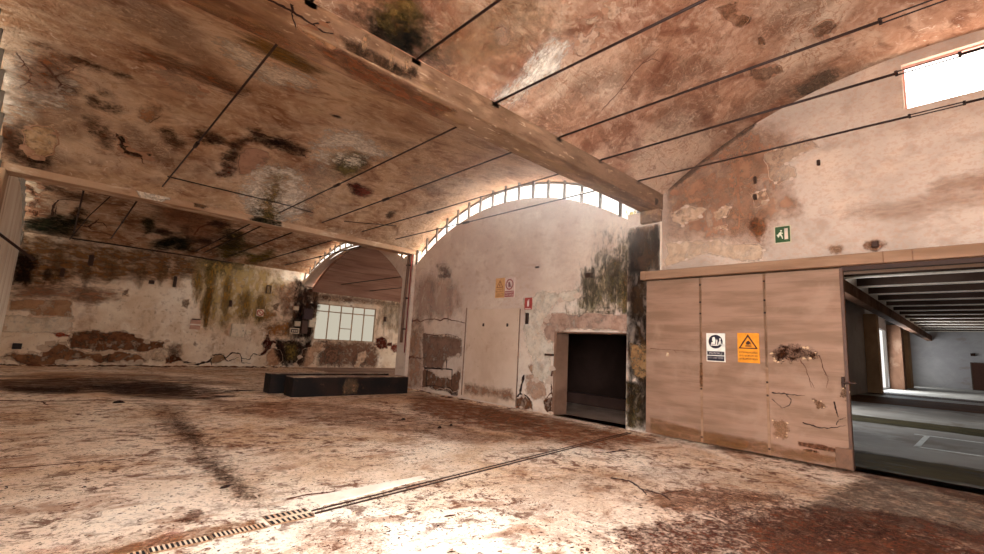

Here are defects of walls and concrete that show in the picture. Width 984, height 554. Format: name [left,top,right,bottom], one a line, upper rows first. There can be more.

leakage [198,0,544,116]
leakage [500,42,567,101]
flaking render [19,124,60,161]
leakage [668,130,796,239]
peeling [664,205,766,267]
leakage [12,186,378,367]
flaking render [0,315,197,365]
crack [184,352,260,365]
flaking render [420,333,462,395]
leakage [581,225,660,424]
peeling [770,343,818,363]
crack [772,355,846,429]